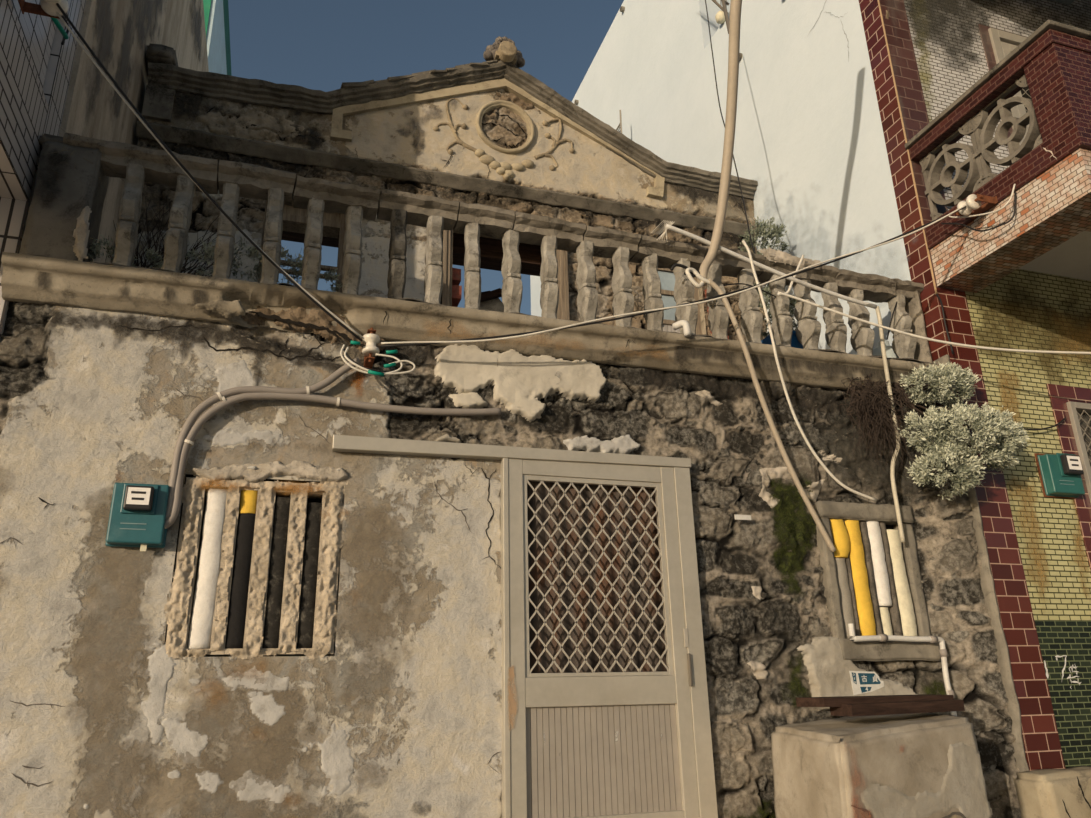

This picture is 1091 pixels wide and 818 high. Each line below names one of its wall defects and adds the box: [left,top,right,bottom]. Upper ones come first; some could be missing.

water stain [90,0,162,117]
water stain [191,0,202,58]
water stain [908,0,984,64]
peeling [198,360,259,398]
peeling [434,344,607,422]
peeling [203,428,281,447]
peeling [435,434,461,443]
spalling [191,460,349,483]
crack [434,465,501,568]
peeling [140,642,292,805]
corrosion [508,666,516,727]
peeling [288,723,354,797]